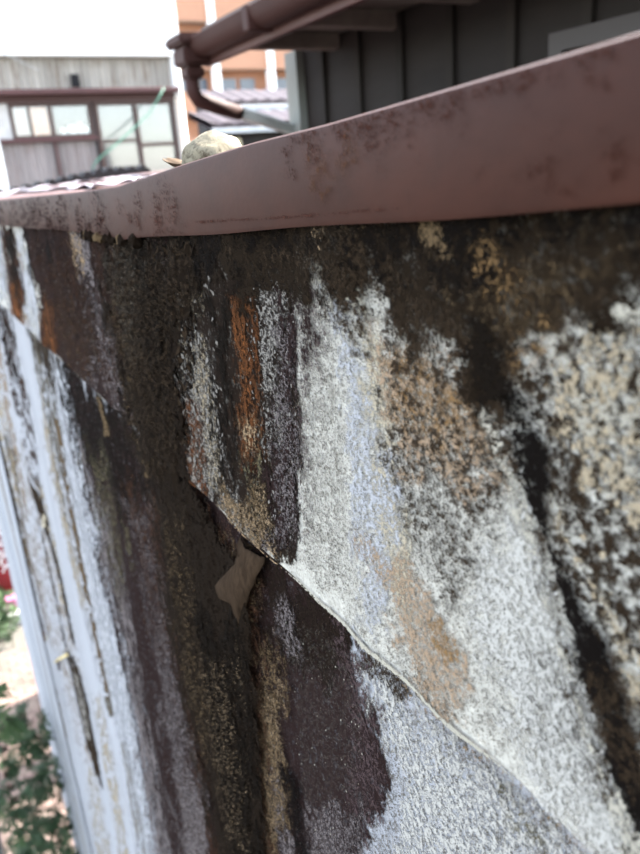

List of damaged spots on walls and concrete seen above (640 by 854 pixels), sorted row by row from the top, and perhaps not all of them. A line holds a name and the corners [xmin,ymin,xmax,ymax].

rust [102,238,246,585]
rust [230,295,263,474]
water stain [0,203,640,854]
crack [460,318,640,852]